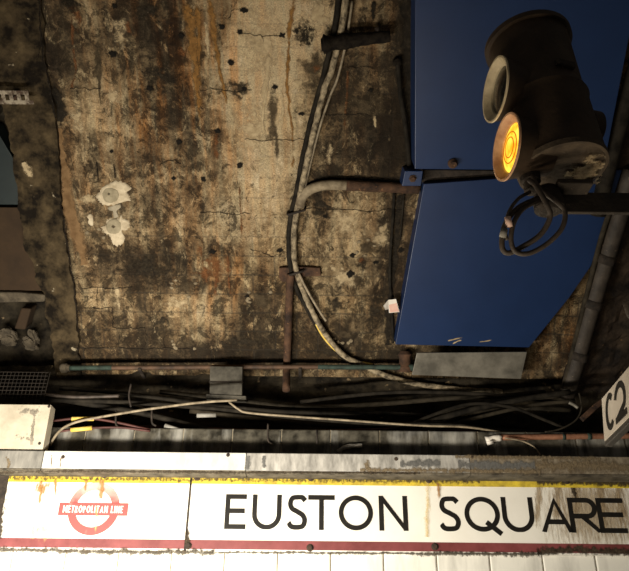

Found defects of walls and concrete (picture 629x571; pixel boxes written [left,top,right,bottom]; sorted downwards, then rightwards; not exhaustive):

leakage [114,0,164,44]
corrosion [179,1,227,117]
leakage [229,6,288,157]
corrosion [285,0,295,145]
leakage [292,58,321,90]
leakage [312,193,357,253]
efflorescence [374,225,387,244]
leakage [326,261,366,315]
corrosion [36,480,57,503]